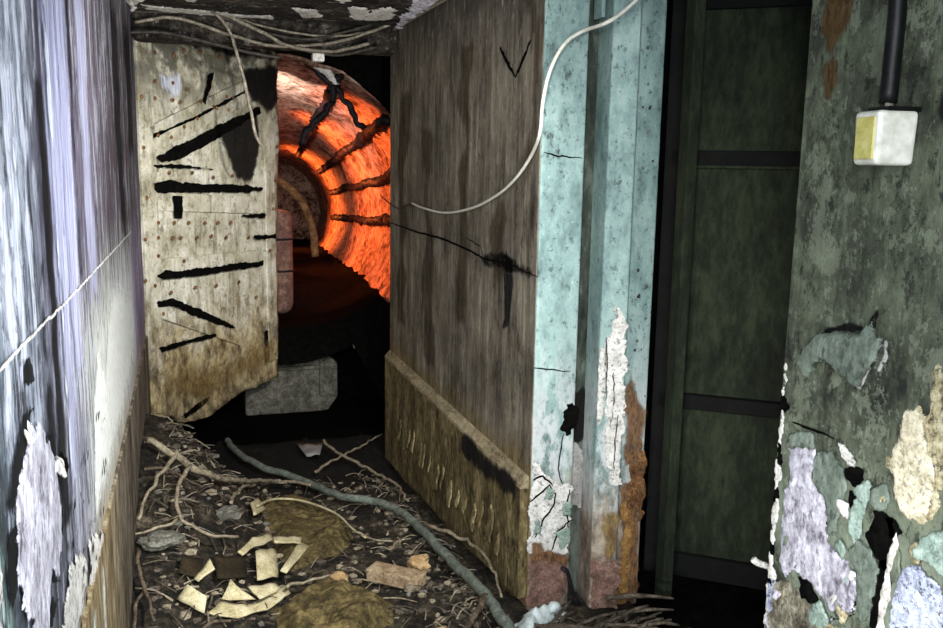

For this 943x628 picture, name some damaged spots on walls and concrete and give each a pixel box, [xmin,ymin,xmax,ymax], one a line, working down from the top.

peeling [126,0,274,20]
peeling [291,8,323,18]
peeling [336,0,439,29]
crack [390,222,538,277]
peeling [24,357,35,386]
peeling [597,307,629,486]
peeling [7,407,104,628]
peeling [527,403,583,555]
rust [603,380,647,604]
peeling [763,363,943,628]